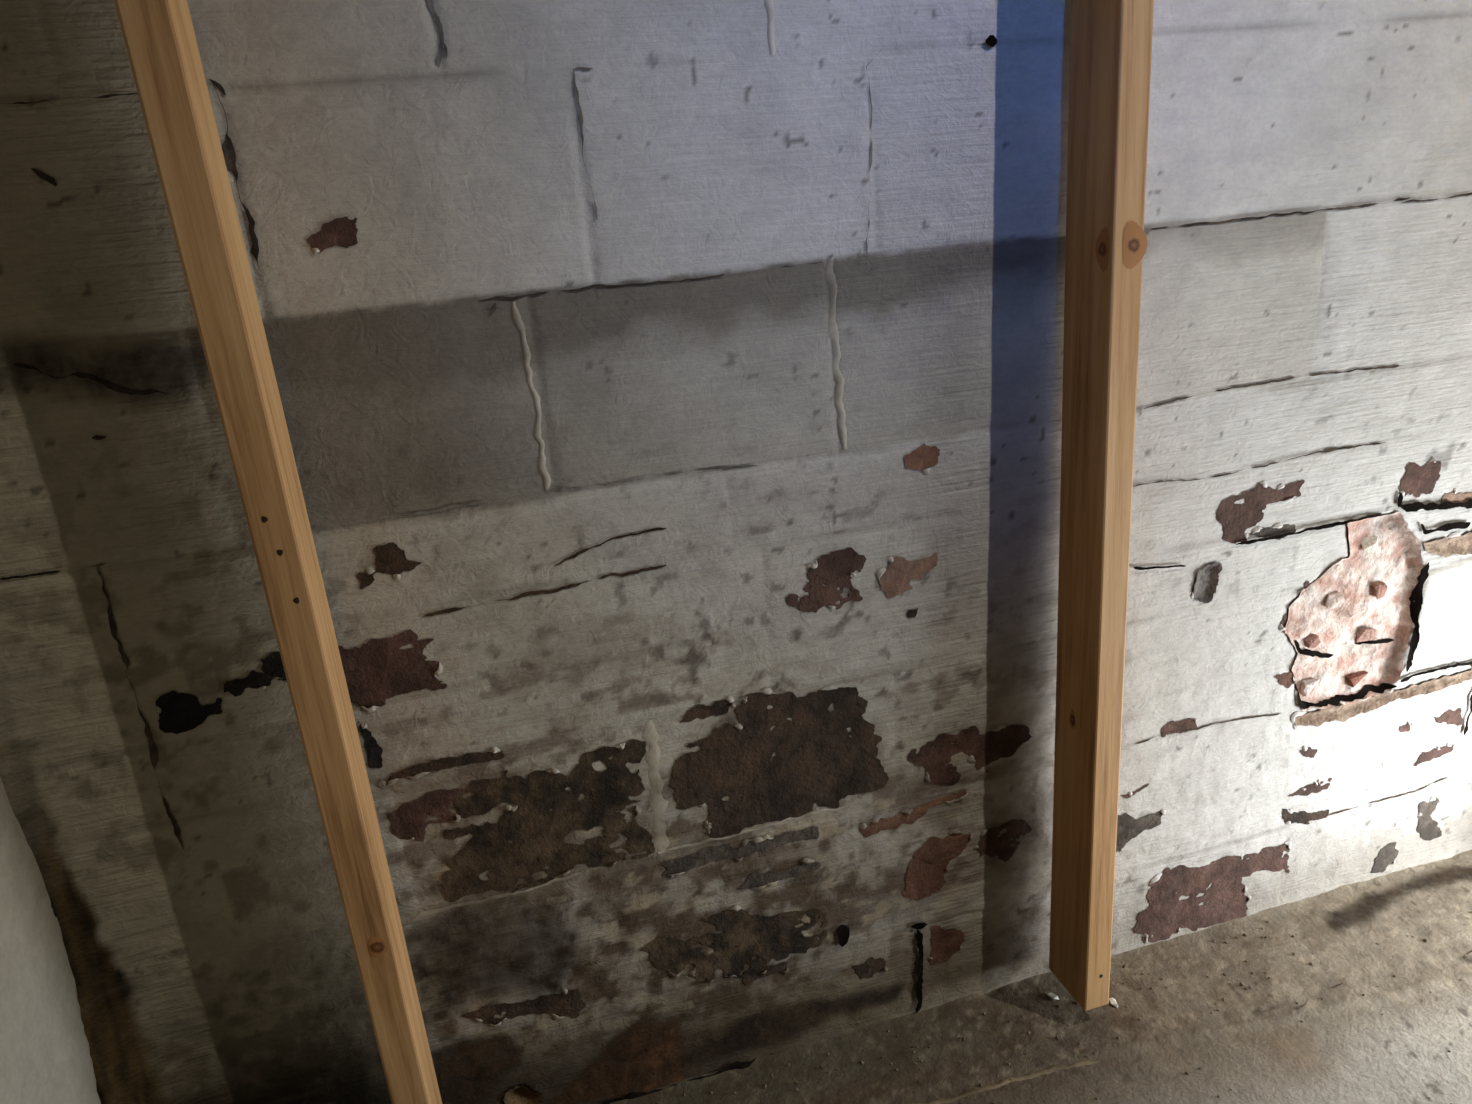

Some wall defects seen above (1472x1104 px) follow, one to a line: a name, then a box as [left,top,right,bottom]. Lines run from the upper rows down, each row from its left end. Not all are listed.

crack [427,0,448,67]
peeling [1217,480,1305,544]
peeling [786,547,938,618]
spalling [1191,562,1223,603]
spalling [1275,457,1472,730]
peeling [155,652,287,734]
peeling [1414,708,1463,767]
peeling [338,629,889,985]
peeling [1417,796,1442,841]
peeling [1133,778,1332,944]
peeling [1371,842,1399,873]
water stain [433,1035,520,1104]